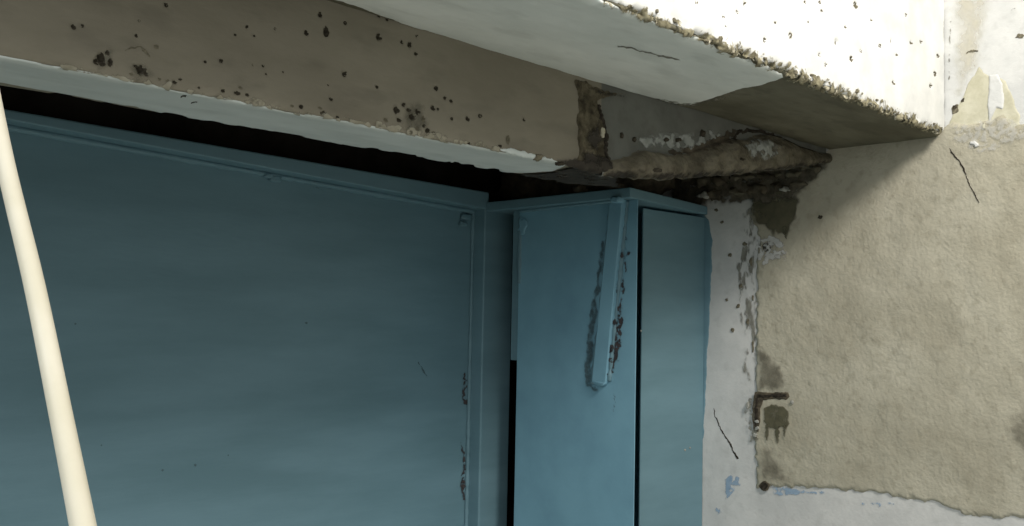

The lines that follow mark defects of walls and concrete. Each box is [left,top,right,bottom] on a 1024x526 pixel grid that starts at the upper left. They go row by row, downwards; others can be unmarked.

spalling [604,0,1020,136]
crack [949,148,979,202]
peeling [725,208,786,380]
crack [714,410,739,459]
water stain [764,404,789,443]